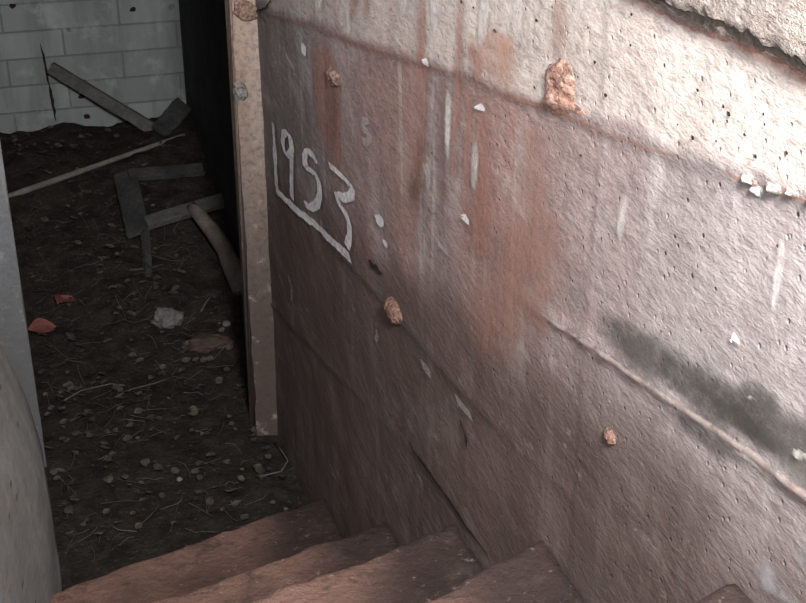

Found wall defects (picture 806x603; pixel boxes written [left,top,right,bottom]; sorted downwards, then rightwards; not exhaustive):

crack [256,0,271,23]
corrosion [441,12,470,187]
crack [653,0,806,72]
damp [612,322,806,486]